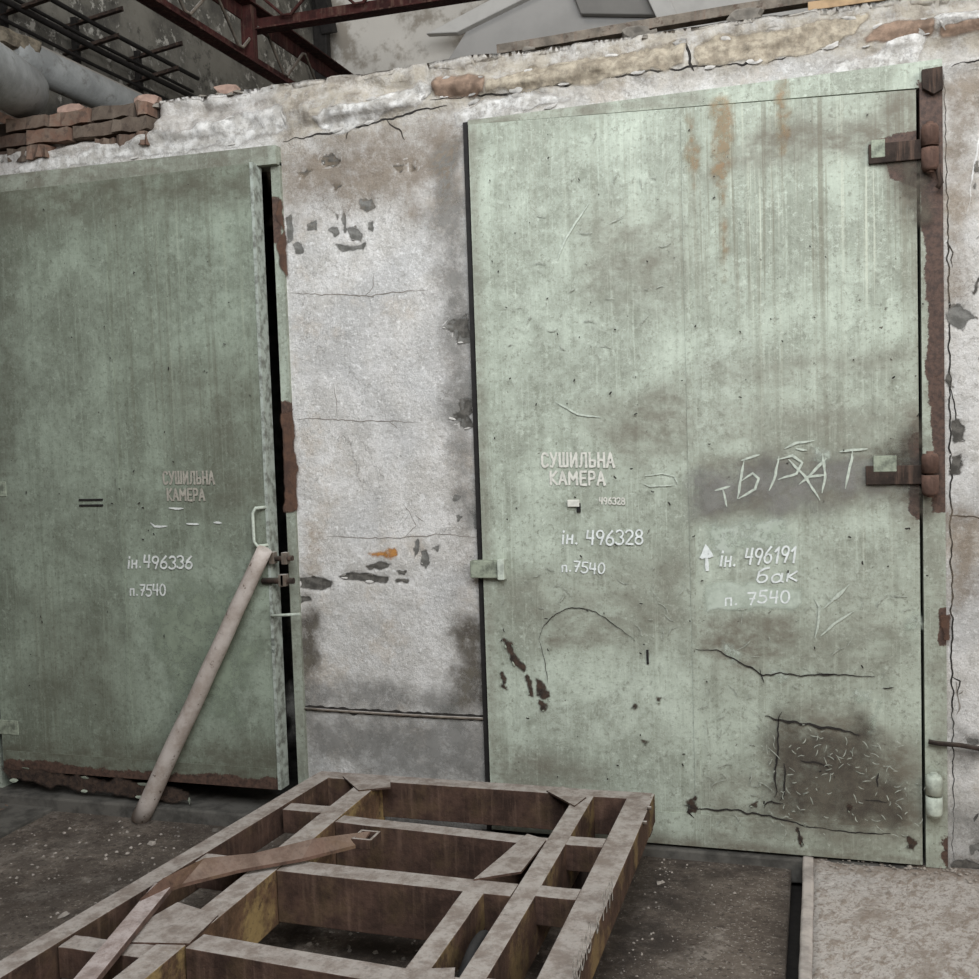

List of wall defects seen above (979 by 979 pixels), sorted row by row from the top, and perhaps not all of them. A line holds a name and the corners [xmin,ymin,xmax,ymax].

crack [608,42,822,78]
flaking render [13,104,287,173]
crack [283,83,572,142]
rust [711,97,732,200]
rust [276,199,288,276]
flaking render [307,199,376,252]
rust [281,409,299,512]
crack [943,59,979,855]
flaking render [300,561,409,603]
flaking render [413,539,439,568]
crack [696,649,894,689]
crack [686,712,891,845]